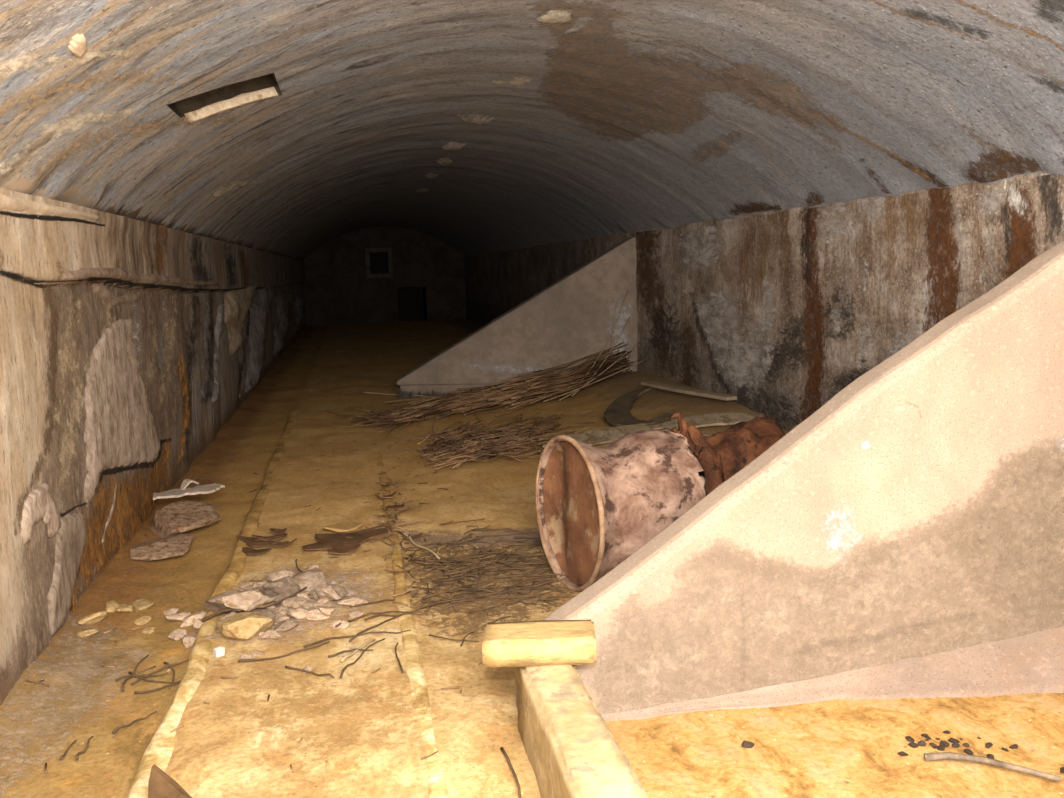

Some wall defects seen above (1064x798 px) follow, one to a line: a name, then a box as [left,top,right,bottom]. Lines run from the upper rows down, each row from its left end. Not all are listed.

leakage [904,9,988,38]
leakage [1036,0,1064,23]
leakage [0,34,175,128]
leakage [1015,58,1064,91]
leakage [0,108,191,174]
crack [0,195,105,227]
crack [0,255,264,293]
corrosion [633,230,698,387]
corrosion [728,193,827,420]
corrosion [860,155,960,333]
corrosion [964,126,1064,279]
leakage [593,440,1064,712]